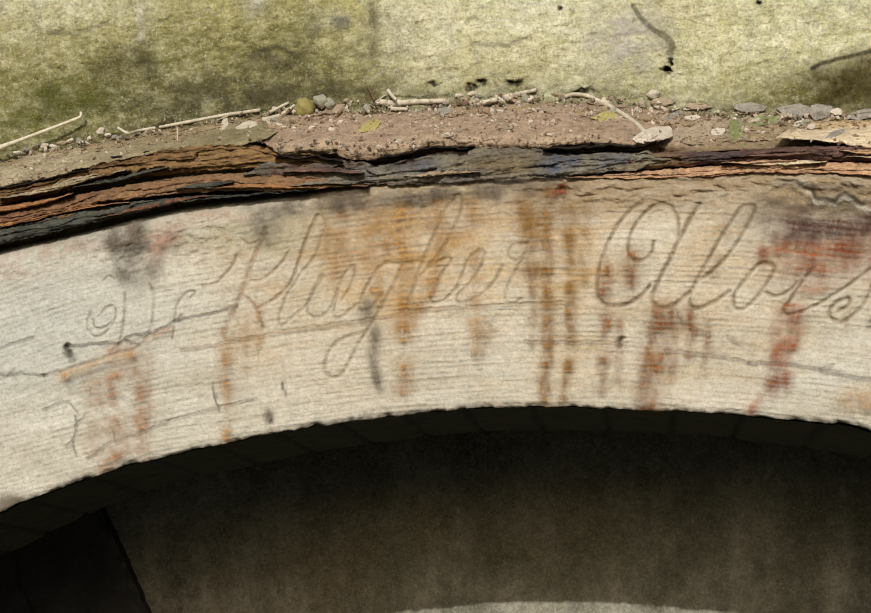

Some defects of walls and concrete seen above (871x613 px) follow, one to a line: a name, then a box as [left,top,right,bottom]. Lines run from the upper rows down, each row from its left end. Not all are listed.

peeling [0,102,871,245]
rust [760,235,864,273]
rust [540,286,554,401]
rust [565,281,575,339]
rust [643,308,674,371]
rust [767,337,797,387]